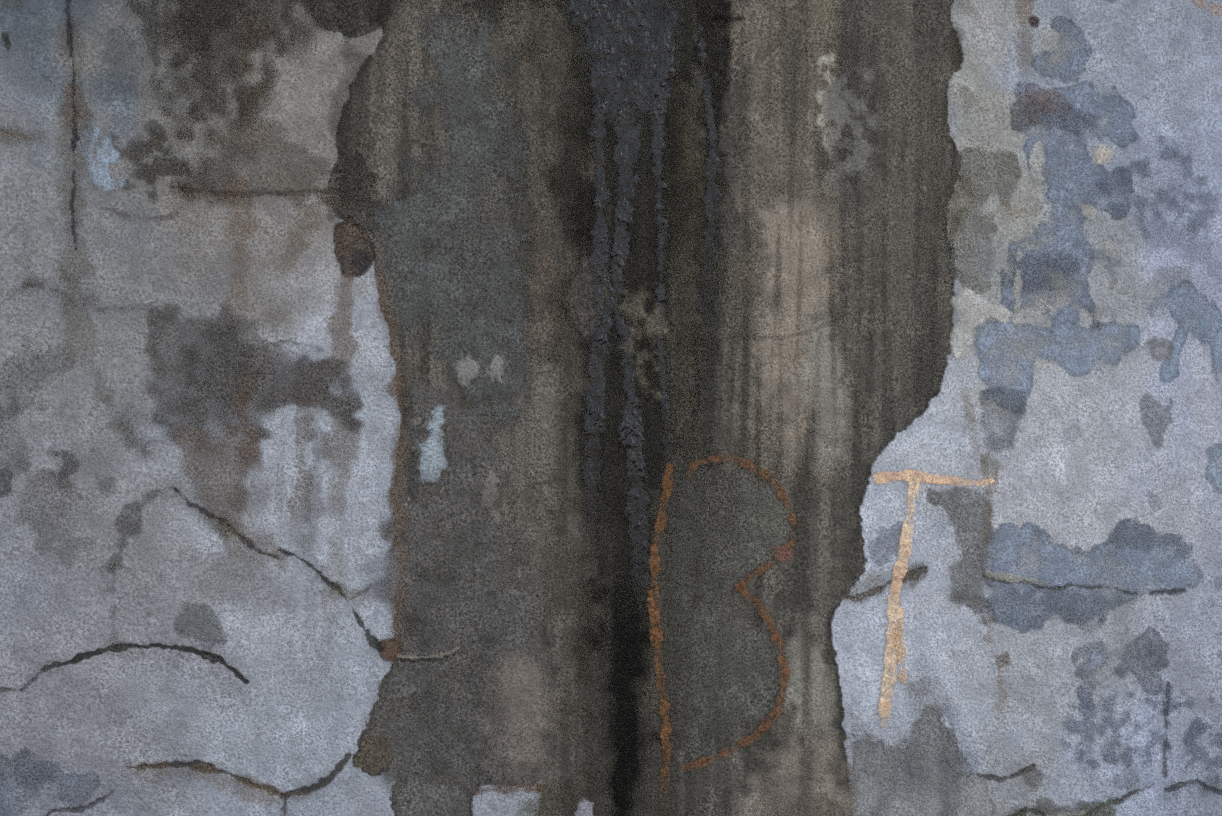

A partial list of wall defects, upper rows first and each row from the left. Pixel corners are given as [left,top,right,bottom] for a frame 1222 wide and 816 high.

leakage [135,0,228,66]
leakage [245,0,331,48]
leakage [345,0,395,35]
crack [65,0,80,250]
leakage [148,304,362,537]
leakage [374,0,877,816]
crack [110,503,140,568]
crack [173,487,450,663]
crack [0,643,249,692]
crack [46,753,351,816]